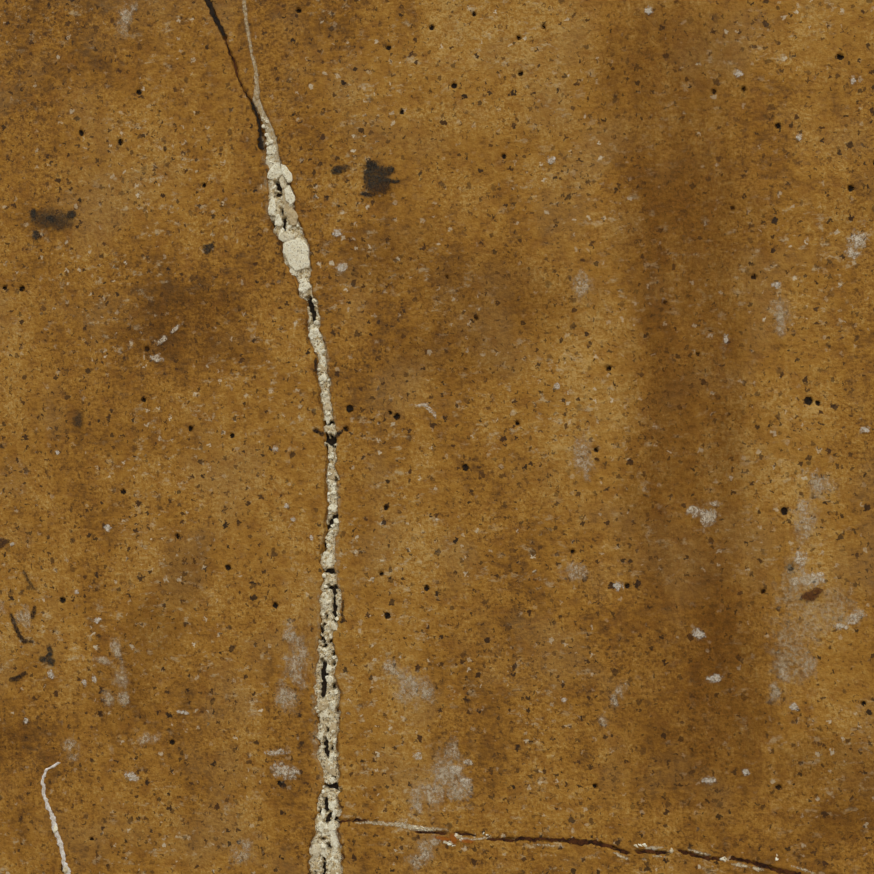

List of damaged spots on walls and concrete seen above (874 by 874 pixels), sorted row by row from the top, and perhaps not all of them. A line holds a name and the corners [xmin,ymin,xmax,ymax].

damp [361,160,400,197]
damp [30,209,76,240]
crack [204,0,814,874]
damp [39,647,55,666]
crack [41,762,71,874]